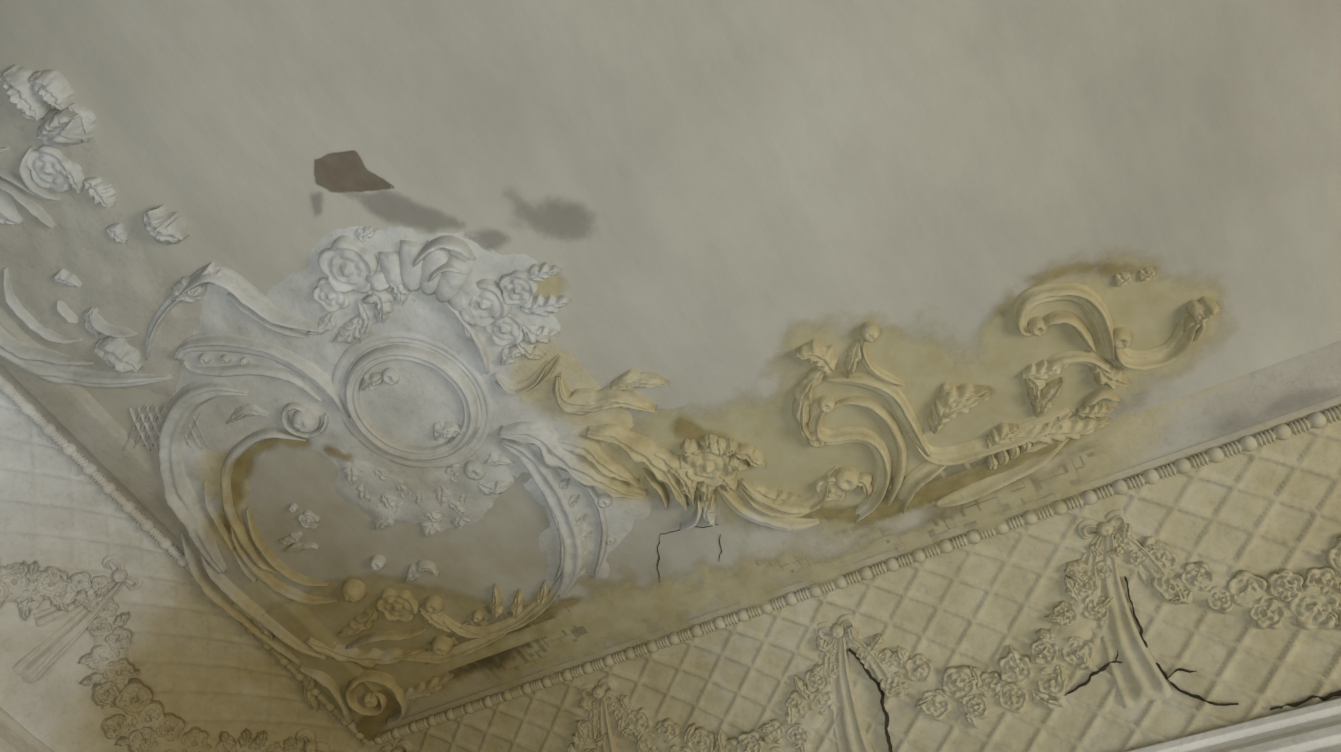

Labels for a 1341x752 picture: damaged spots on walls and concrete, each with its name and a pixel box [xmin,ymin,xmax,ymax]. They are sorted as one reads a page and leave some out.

peeling [314,151,394,192]
leakage [265,256,1221,741]
crack [1065,576,1341,710]